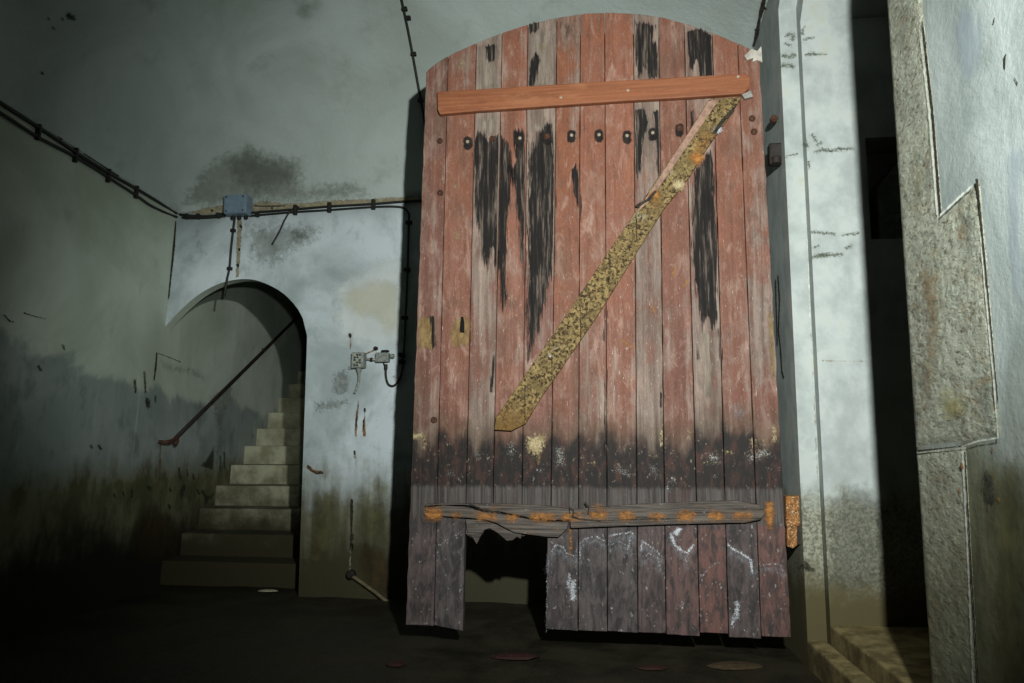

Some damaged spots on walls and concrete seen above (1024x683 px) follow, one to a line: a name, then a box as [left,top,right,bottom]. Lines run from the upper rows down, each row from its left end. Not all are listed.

corrosion [355,401,366,436]